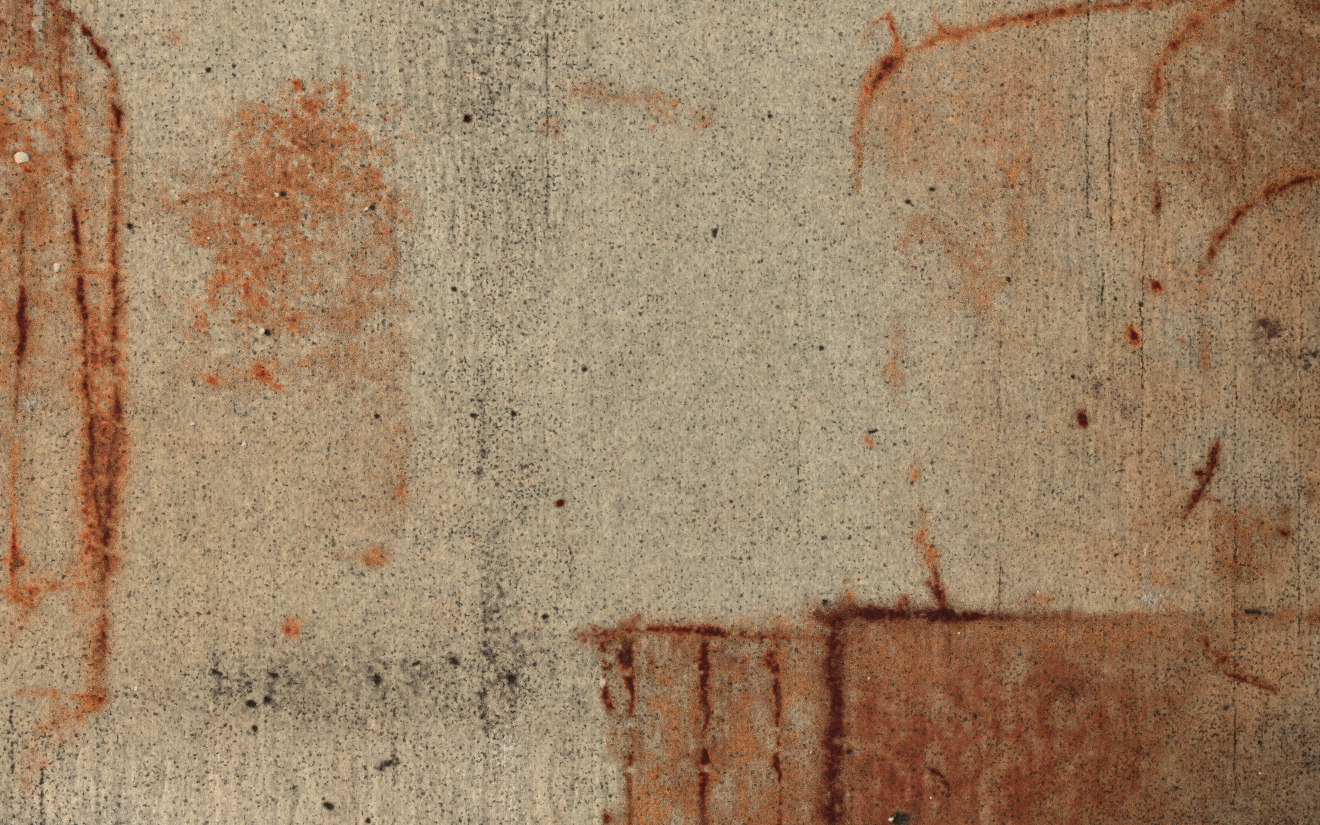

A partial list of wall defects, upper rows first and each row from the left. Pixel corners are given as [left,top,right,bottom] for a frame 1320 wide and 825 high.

corrosion [162,79,410,335]
corrosion [854,0,1320,309]
corrosion [0,0,131,731]
corrosion [252,358,282,390]
corrosion [1076,408,1089,429]
corrosion [1126,324,1141,348]
corrosion [1163,441,1292,582]
corrosion [577,511,1277,825]
corrosion [1228,607,1320,628]